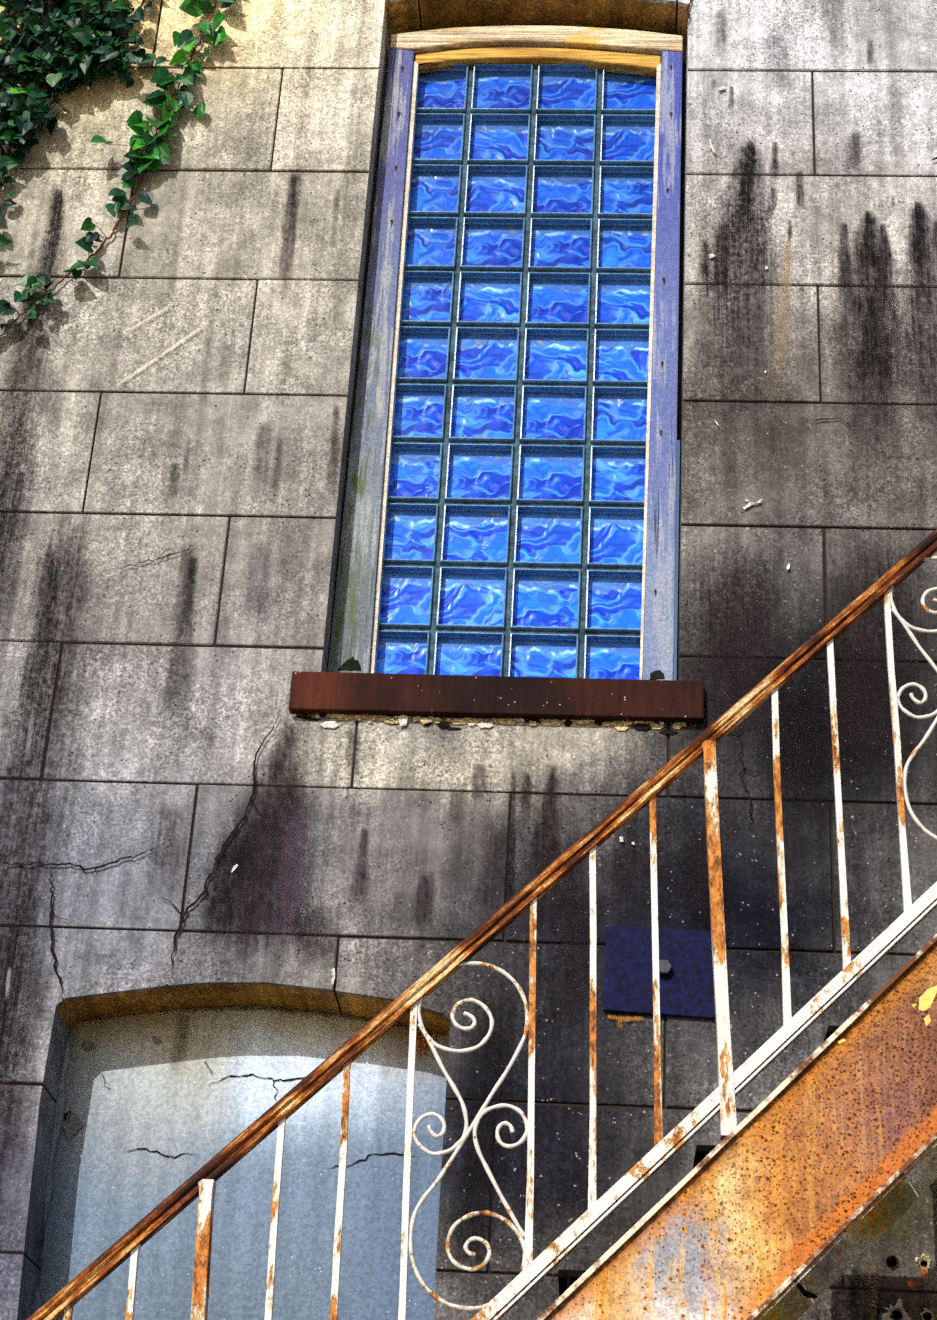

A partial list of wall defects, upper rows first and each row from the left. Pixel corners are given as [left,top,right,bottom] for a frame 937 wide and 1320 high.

crack [684,0,692,28]
water stain [0,192,63,614]
water stain [701,142,792,369]
water stain [849,133,859,161]
water stain [840,202,937,443]
water stain [0,536,83,1172]
crack [0,841,170,1014]
crack [161,709,280,998]
corrosion [416,1029,435,1054]
corrosion [794,1281,818,1298]